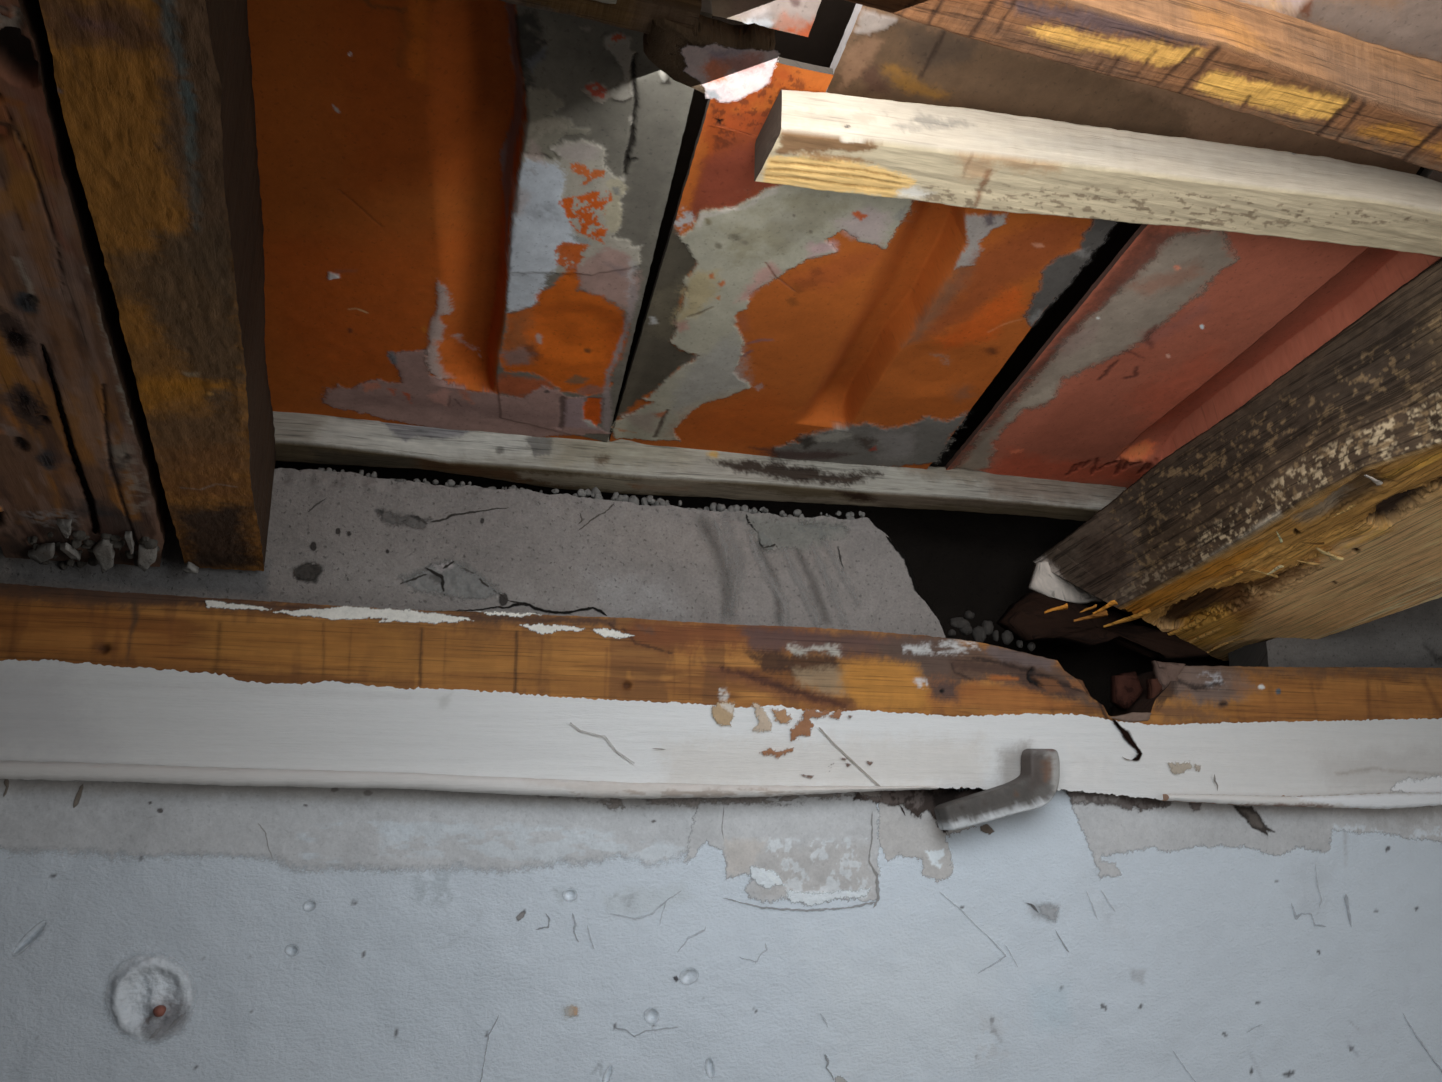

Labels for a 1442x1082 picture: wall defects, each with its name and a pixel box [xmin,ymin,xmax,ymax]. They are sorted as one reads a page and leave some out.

crack [400,561,607,616]
peeling [712,701,852,758]
peeling [0,774,994,906]